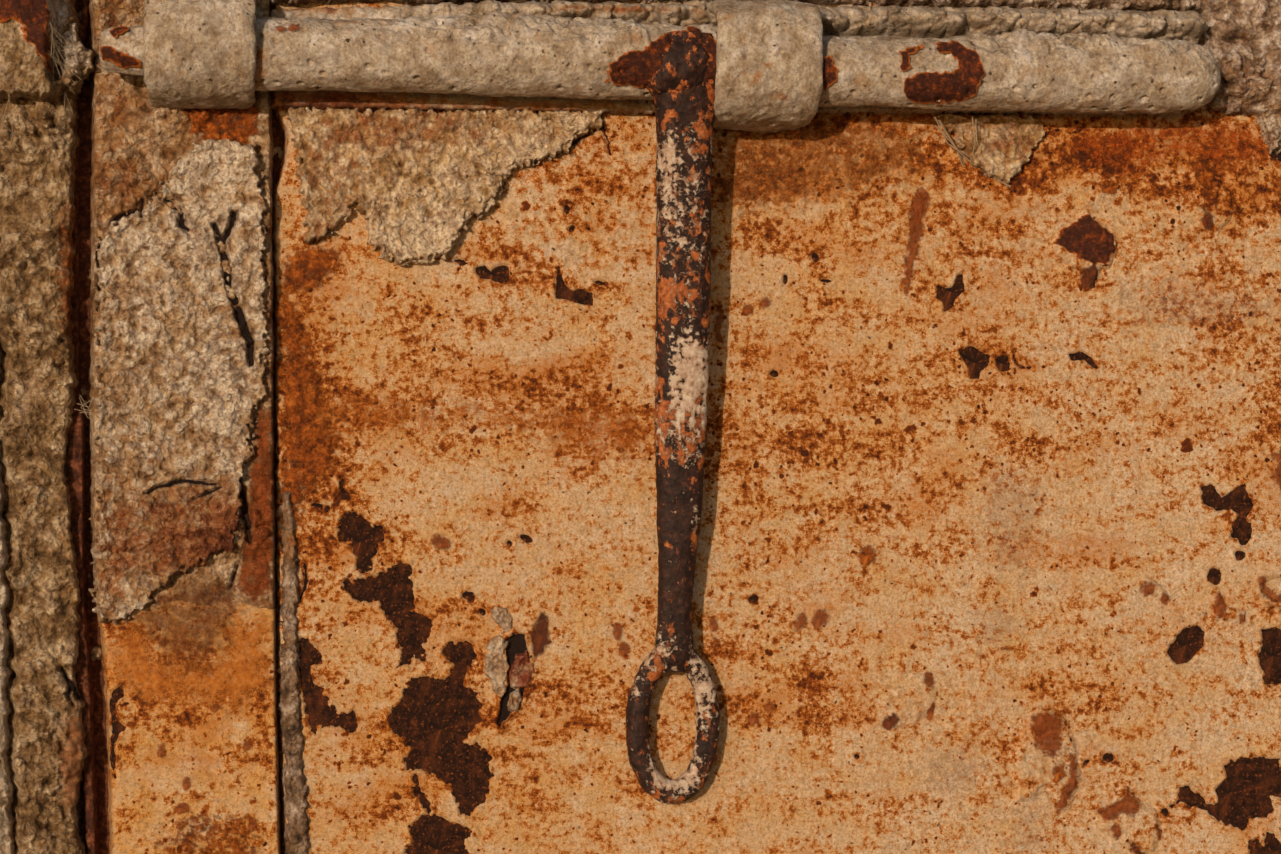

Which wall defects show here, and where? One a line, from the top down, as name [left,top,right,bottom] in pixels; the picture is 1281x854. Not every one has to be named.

corrosion [0,0,53,72]
corrosion [899,40,985,105]
crack [95,198,253,367]
peeling [287,107,603,284]
corrosion [901,187,930,295]
corrosion [1050,209,1118,292]
corrosion [109,244,439,712]
crack [144,479,251,587]
corrosion [531,612,552,660]
corrosion [1009,704,1082,813]
corrosion [153,777,261,854]
corrosion [1093,785,1164,854]